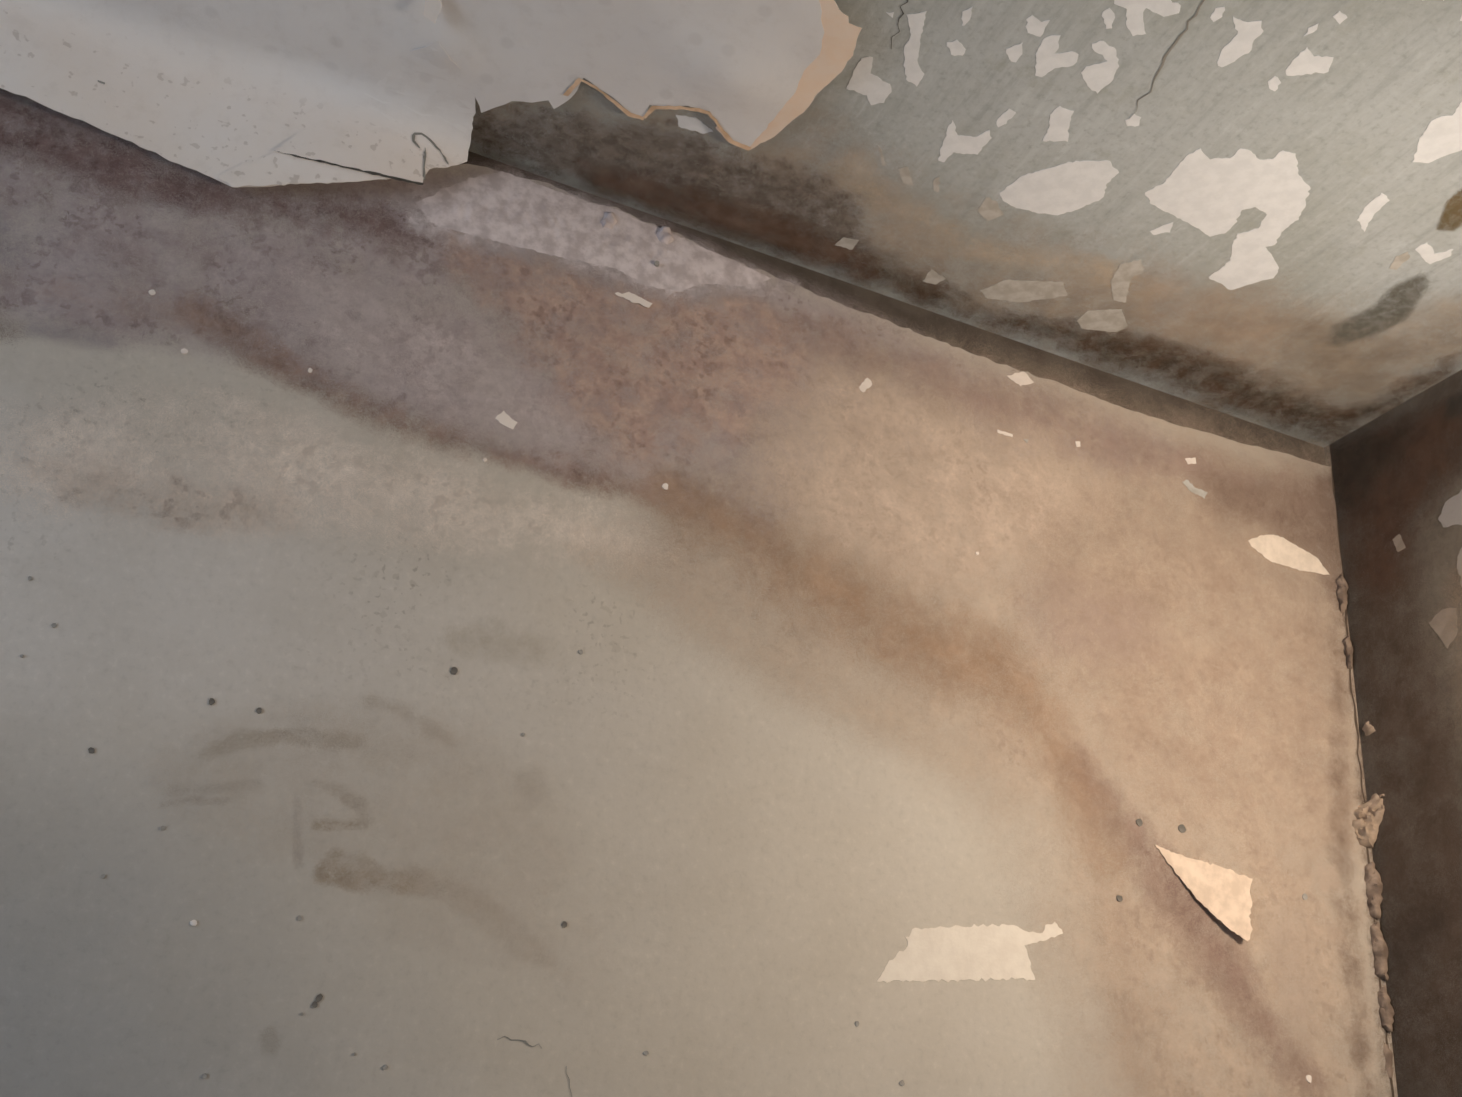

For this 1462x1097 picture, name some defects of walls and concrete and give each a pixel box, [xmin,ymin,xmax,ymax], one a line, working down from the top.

peeling [846,11,927,105]
peeling [1006,0,1181,94]
peeling [1210,6,1263,67]
peeling [1268,11,1348,91]
peeling [675,114,713,134]
peeling [933,109,1016,193]
peeling [978,160,1119,221]
peeling [1145,148,1311,290]
peeling [1412,102,1462,163]
peeling [1077,259,1144,332]
peeling [1438,489,1462,528]
crack [1331,468,1395,1097]